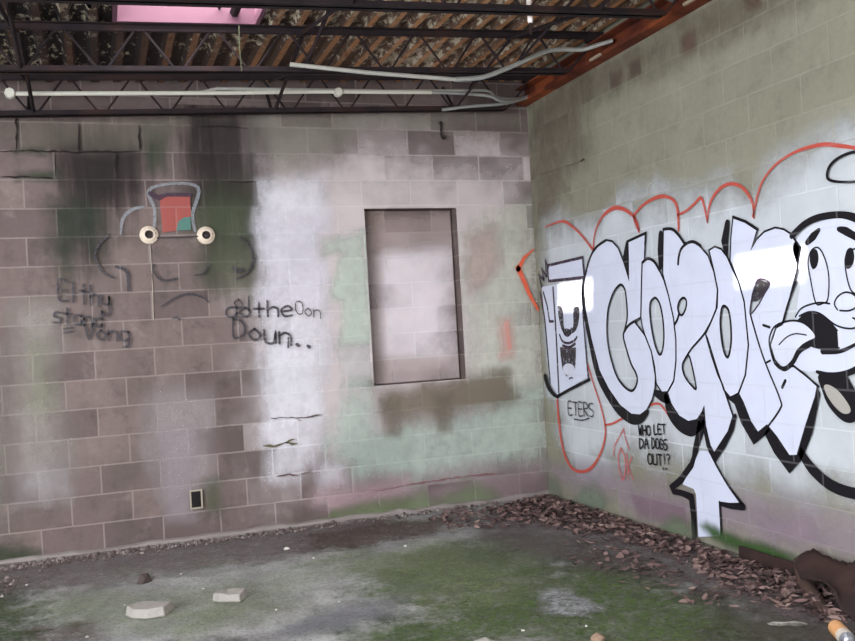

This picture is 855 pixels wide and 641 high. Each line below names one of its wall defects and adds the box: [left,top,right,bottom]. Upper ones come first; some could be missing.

leakage [58,131,138,202]
leakage [192,115,254,210]